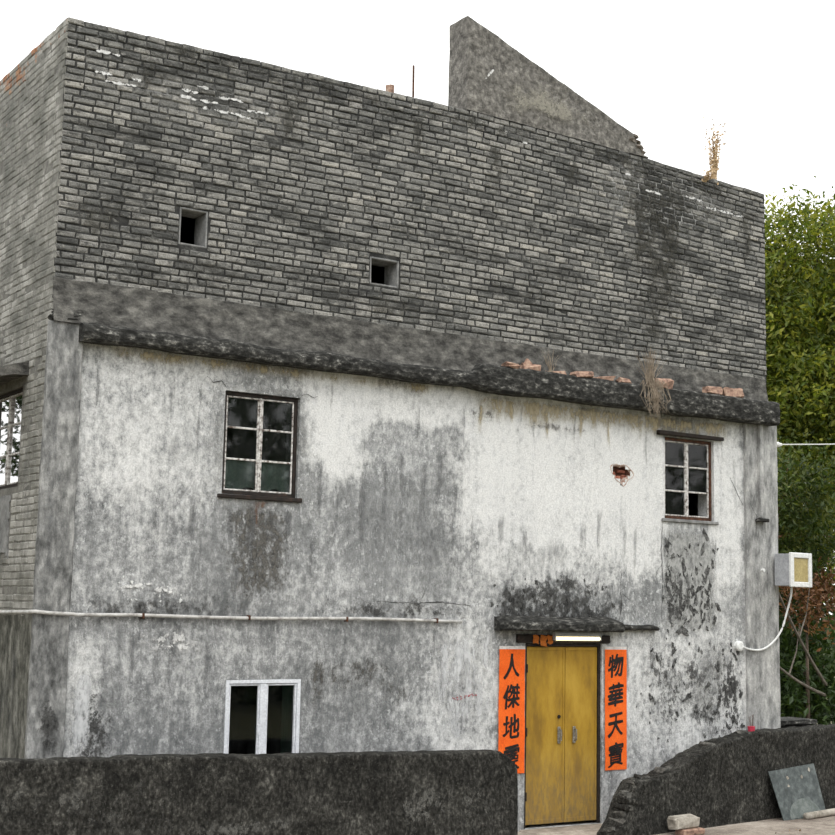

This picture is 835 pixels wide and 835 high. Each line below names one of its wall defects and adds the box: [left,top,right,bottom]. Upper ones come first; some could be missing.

water stain [473,398,723,436]
spalling [610,464,634,487]
water stain [229,508,289,596]
water stain [350,603,391,616]
water stain [404,599,441,617]
water stain [490,575,622,619]
peeling [662,528,721,669]
peeling [673,642,745,738]